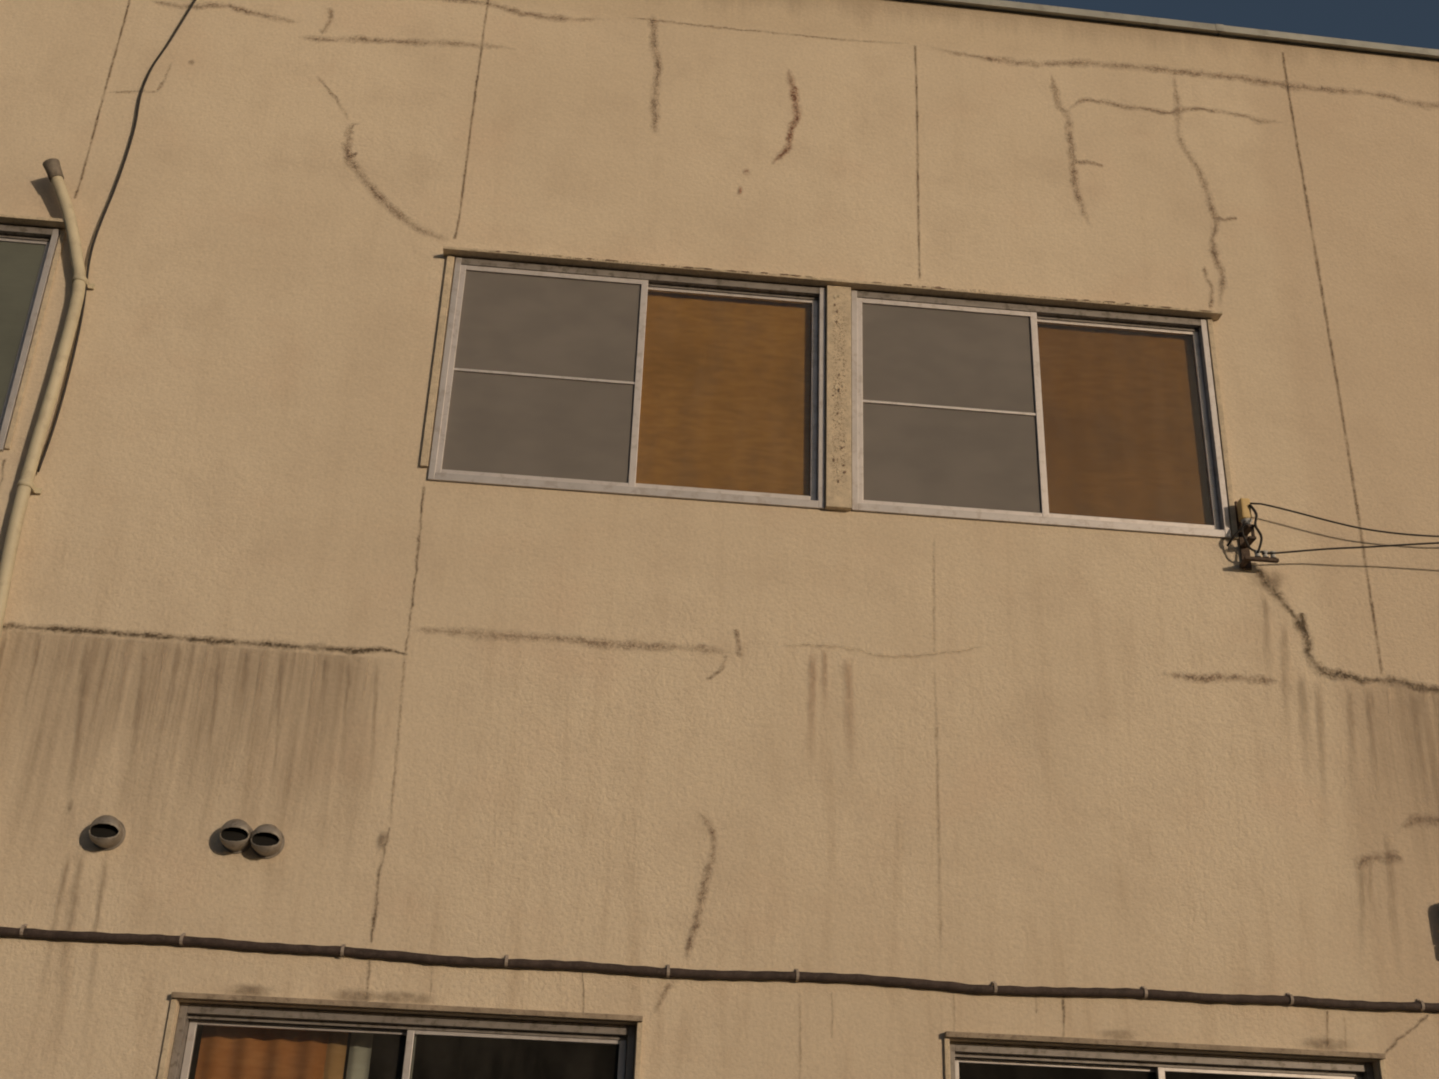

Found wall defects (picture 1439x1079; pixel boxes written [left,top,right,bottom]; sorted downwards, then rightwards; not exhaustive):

crack [777,81,799,159]
crack [345,148,401,217]
crack [1204,206,1236,303]
crack [3,624,405,654]
crack [1259,570,1439,692]
crack [1186,674,1266,682]
crack [687,878,708,949]